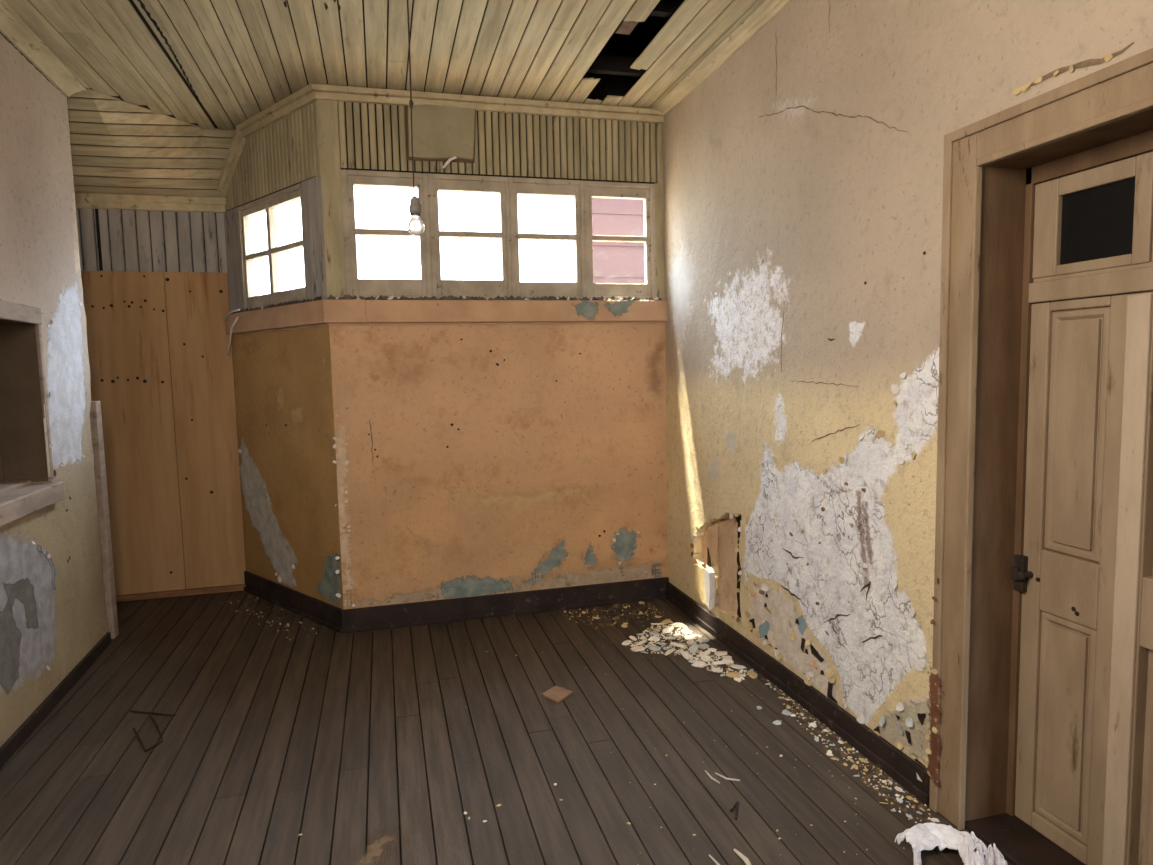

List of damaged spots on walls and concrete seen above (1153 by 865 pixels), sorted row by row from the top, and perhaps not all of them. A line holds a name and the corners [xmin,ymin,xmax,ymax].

crack [0,32,66,97]
crack [760,40,906,132]
peeling [43,96,89,478]
peeling [0,520,71,710]
peeling [238,431,300,592]
peeling [509,524,666,592]
peeling [665,230,944,788]